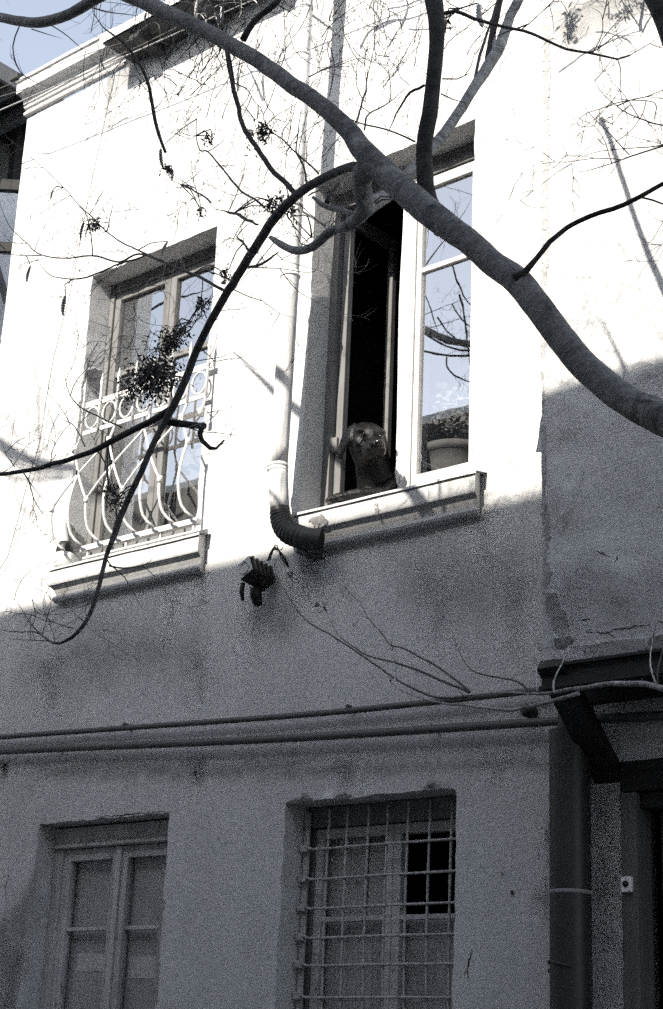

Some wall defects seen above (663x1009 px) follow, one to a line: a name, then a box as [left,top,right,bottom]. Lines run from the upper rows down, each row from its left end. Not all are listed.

spalling [540,23,551,293]
spalling [540,371,663,662]
crack [582,618,661,638]